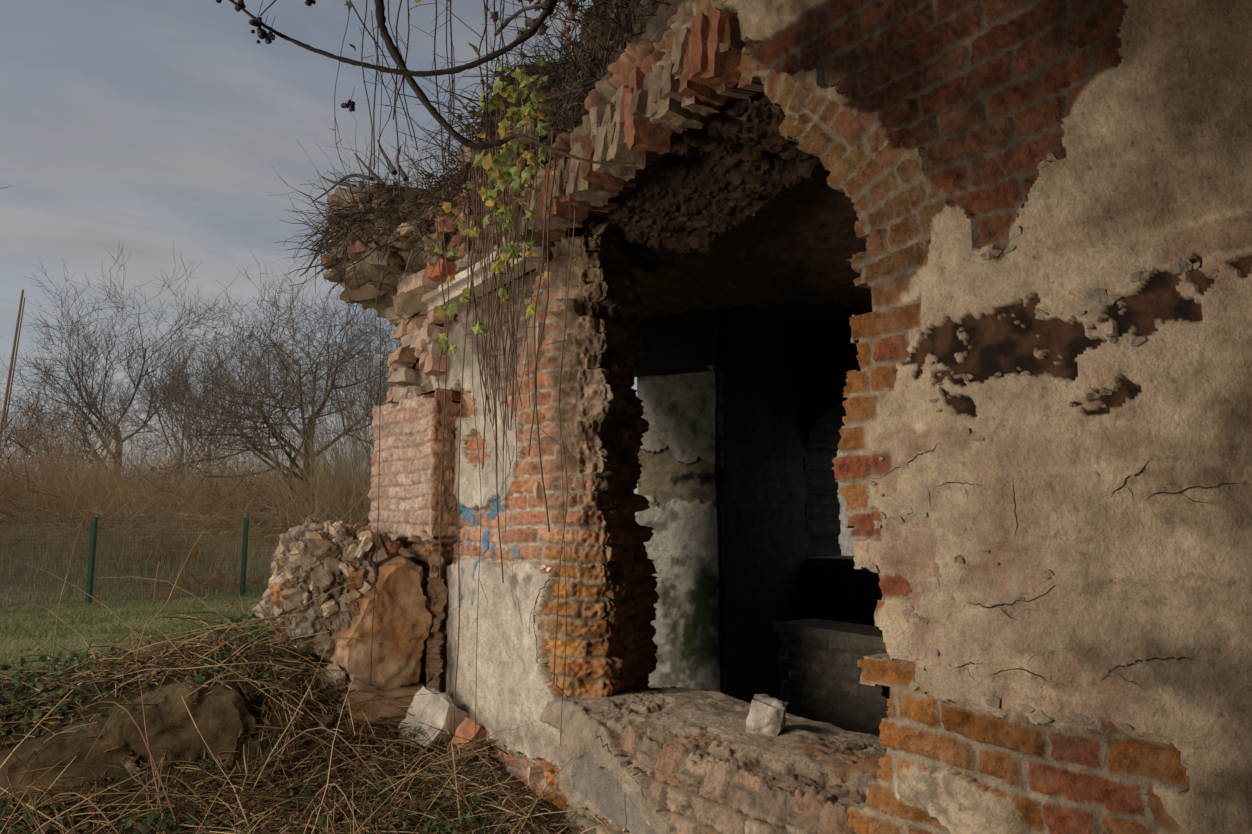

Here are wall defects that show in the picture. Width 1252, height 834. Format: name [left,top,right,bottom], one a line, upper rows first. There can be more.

spalling [533,758,569,811]
spalling [449,0,1129,699]
crack [966,585,1056,621]
spalling [847,509,1190,834]
peeling [869,252,1252,496]
crack [1111,460,1245,504]